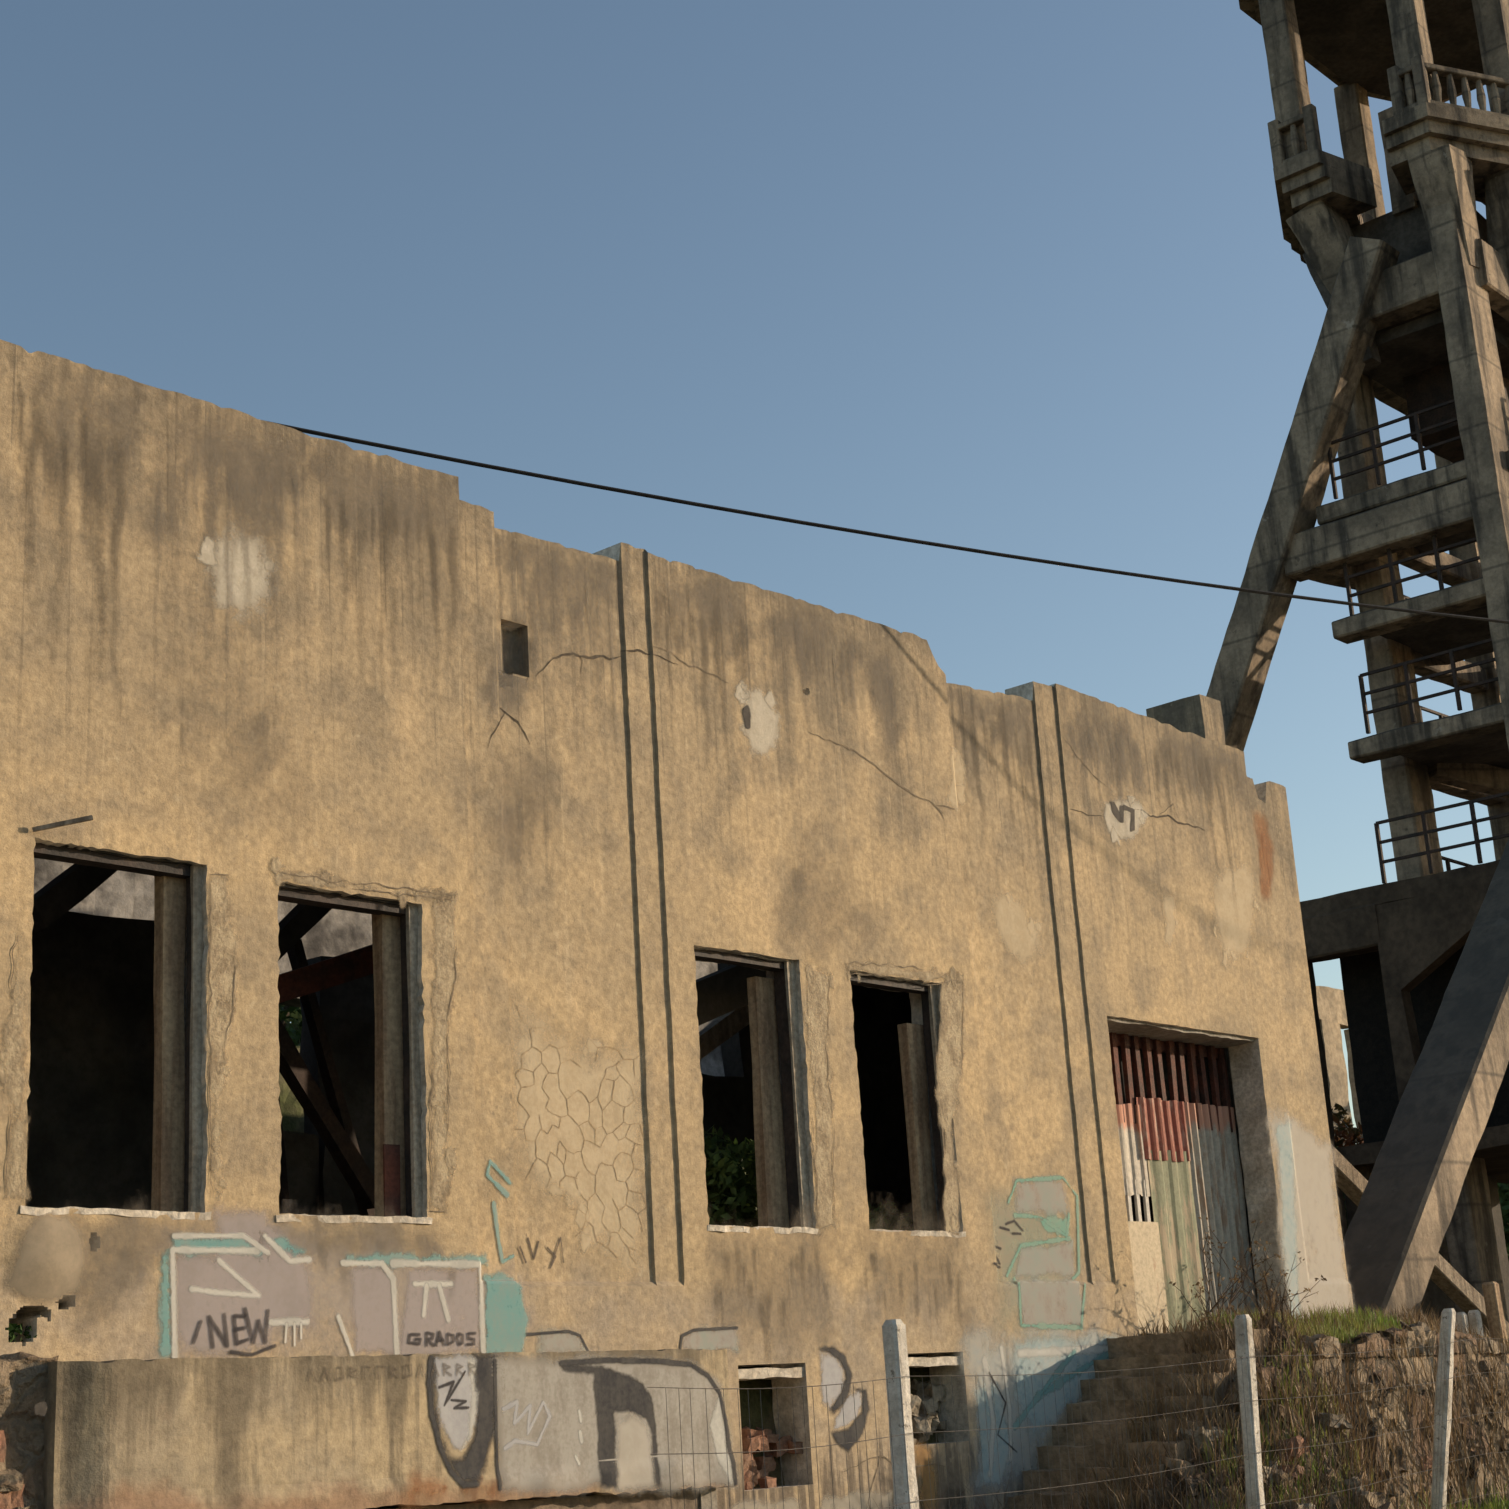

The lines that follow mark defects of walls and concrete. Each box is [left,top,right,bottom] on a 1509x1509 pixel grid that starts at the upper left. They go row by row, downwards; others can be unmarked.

spalling [198,526,277,621]
crack [536,646,728,683]
crack [488,707,530,747]
spalling [735,681,780,755]
crack [809,732,957,821]
spalling [1104,796,1148,845]
corrosion [1258,819,1272,896]
crack [514,1007,647,1262]